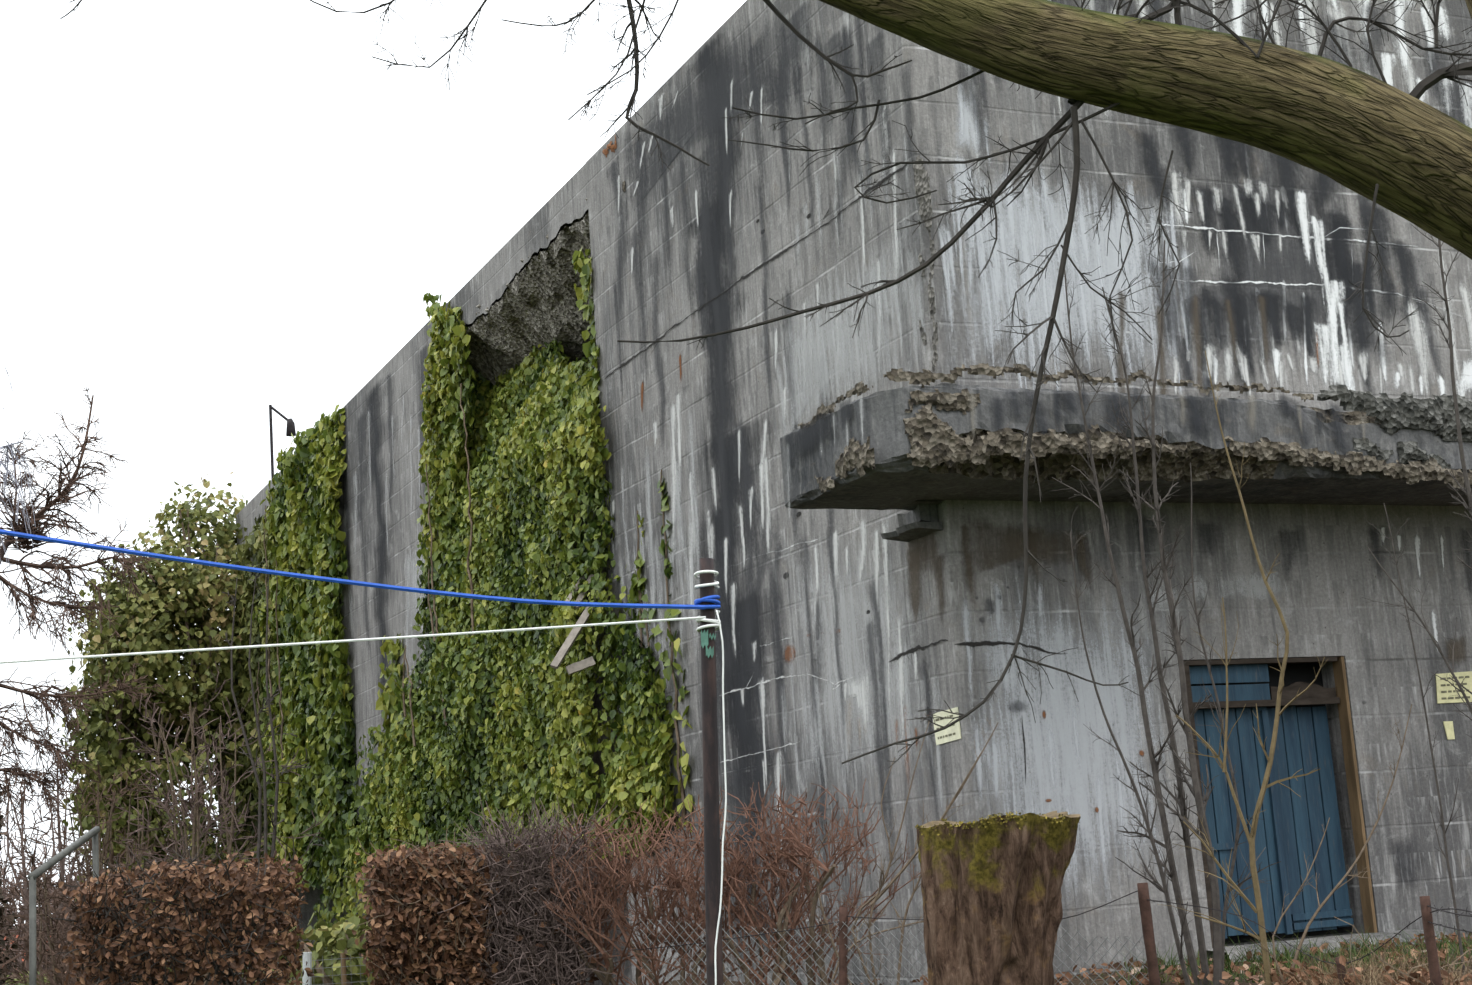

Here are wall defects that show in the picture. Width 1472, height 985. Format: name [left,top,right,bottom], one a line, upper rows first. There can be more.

water stain [1089,0,1175,24]
water stain [1212,0,1281,45]
water stain [1298,0,1472,128]
water stain [611,9,944,955]
water stain [962,519,1162,881]
spalling [798,155,1472,493]
water stain [939,64,1472,451]
water stain [1372,527,1421,576]